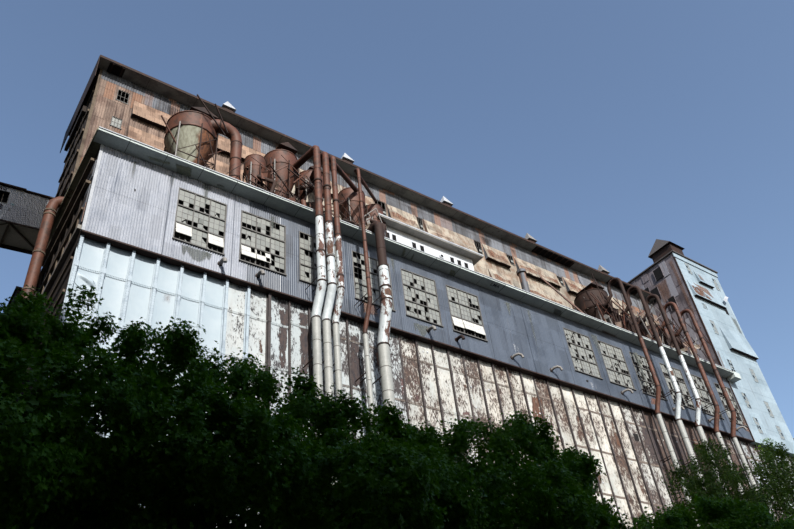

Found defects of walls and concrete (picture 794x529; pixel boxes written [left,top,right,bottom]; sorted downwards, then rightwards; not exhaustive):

peeling [279,309,309,378]
peeling [350,333,363,387]
peeling [531,395,553,426]